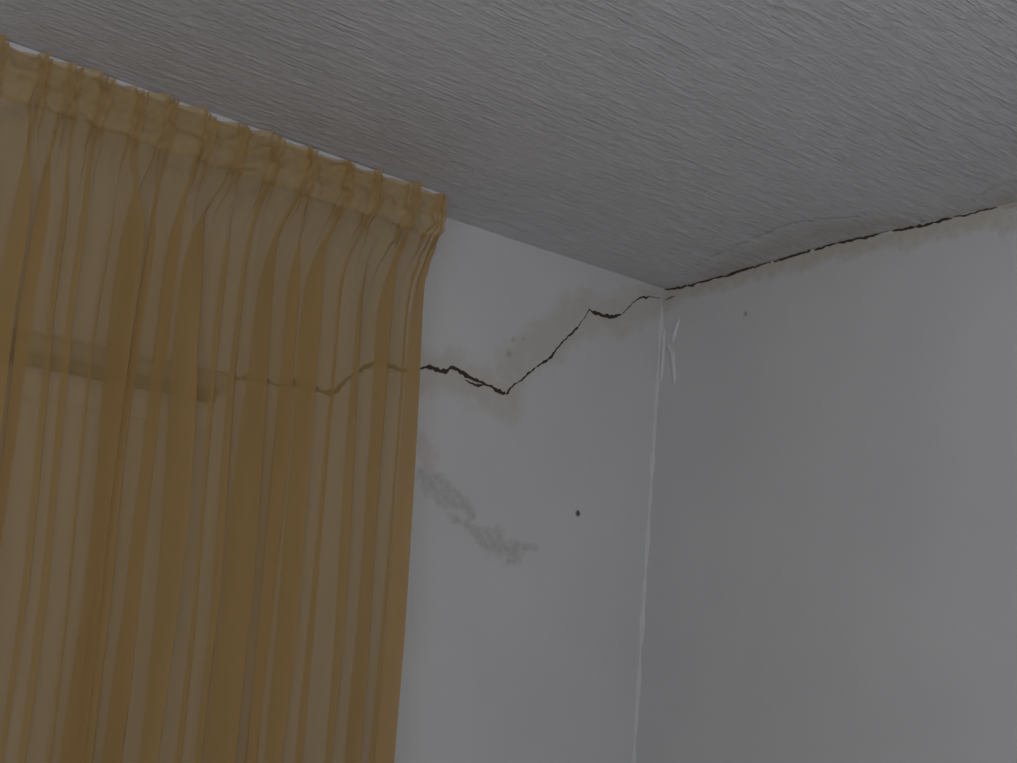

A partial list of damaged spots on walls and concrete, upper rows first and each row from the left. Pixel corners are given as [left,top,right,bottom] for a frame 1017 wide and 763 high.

crack [420,207,997,395]